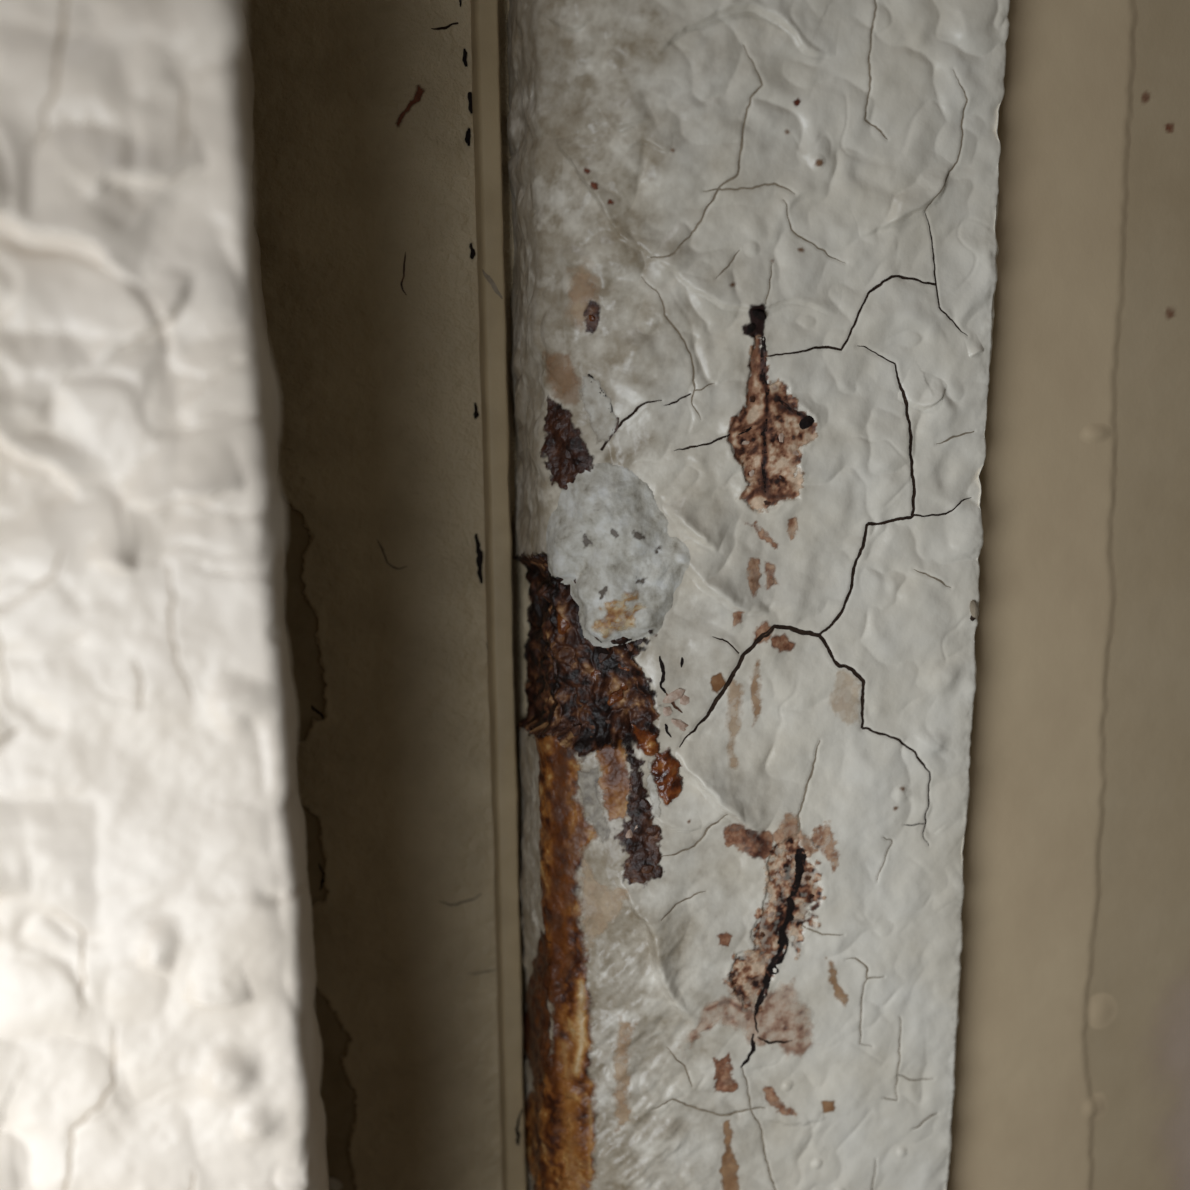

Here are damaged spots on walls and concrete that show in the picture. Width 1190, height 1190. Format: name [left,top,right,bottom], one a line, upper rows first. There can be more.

crack [864,0,888,140]
crack [600,45,844,451]
corrosion [540,355,593,490]
crack [679,70,974,879]
peeling [284,502,326,741]
peeling [302,806,329,905]
corrosion [515,553,683,1190]
crack [661,891,705,921]
crack [661,814,728,857]
spalling [690,814,839,1068]
crack [802,925,882,1046]
peeling [314,989,357,1190]